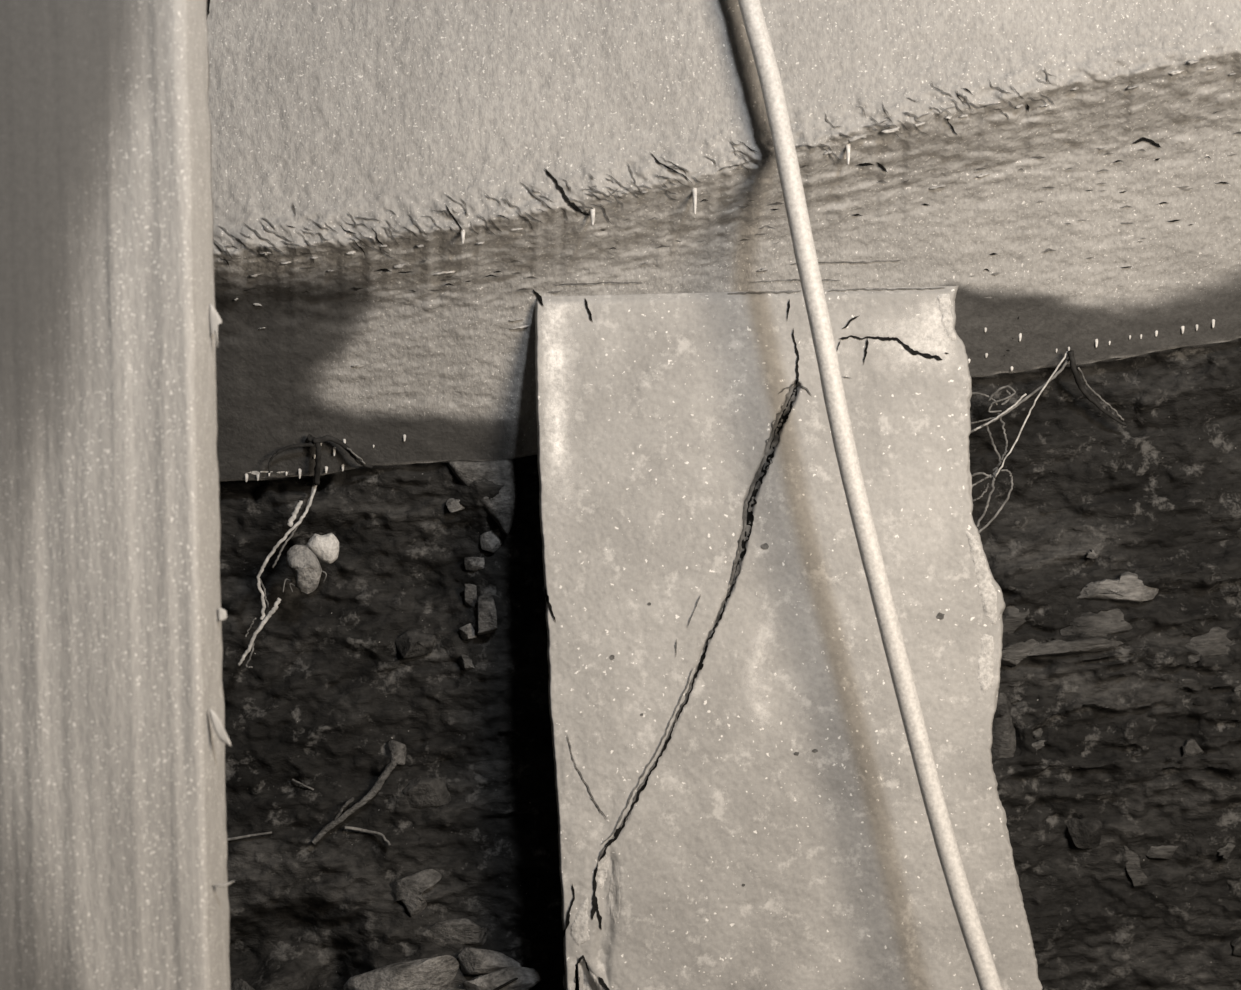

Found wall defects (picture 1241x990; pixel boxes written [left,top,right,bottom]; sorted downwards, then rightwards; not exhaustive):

crack [213,138,949,990]